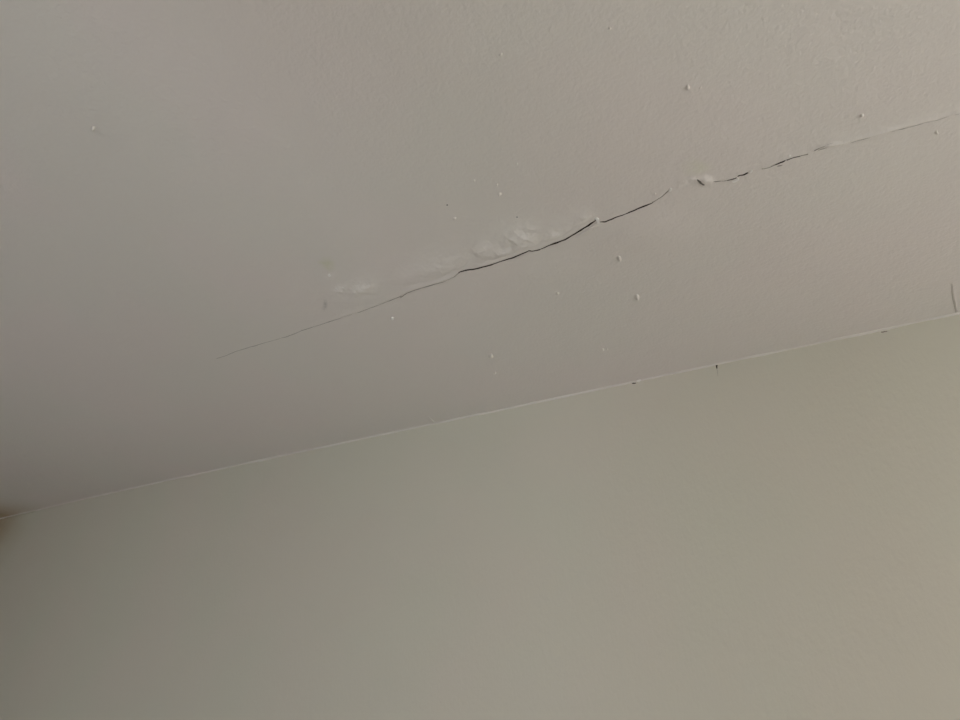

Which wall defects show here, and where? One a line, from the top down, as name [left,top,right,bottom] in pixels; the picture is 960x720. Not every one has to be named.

crack [220,185,672,358]